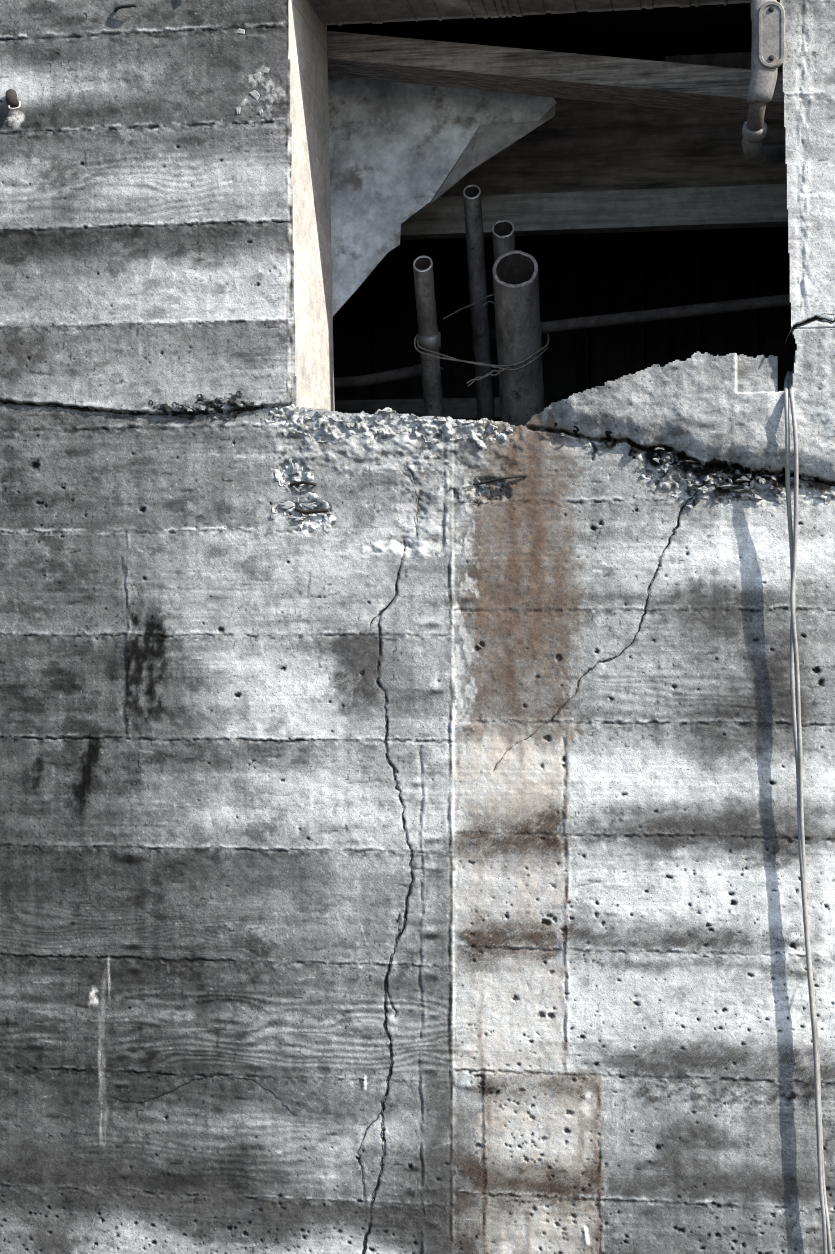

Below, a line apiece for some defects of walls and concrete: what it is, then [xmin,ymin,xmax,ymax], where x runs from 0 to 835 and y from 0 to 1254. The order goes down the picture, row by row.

crack [2,400,276,416]
spalling [149,391,516,450]
spalling [271,458,337,532]
spalling [451,474,527,506]
spalling [599,431,835,510]
corrosion [461,413,582,815]
crack [494,428,835,770]
damp [122,612,168,723]
crack [358,464,419,1254]